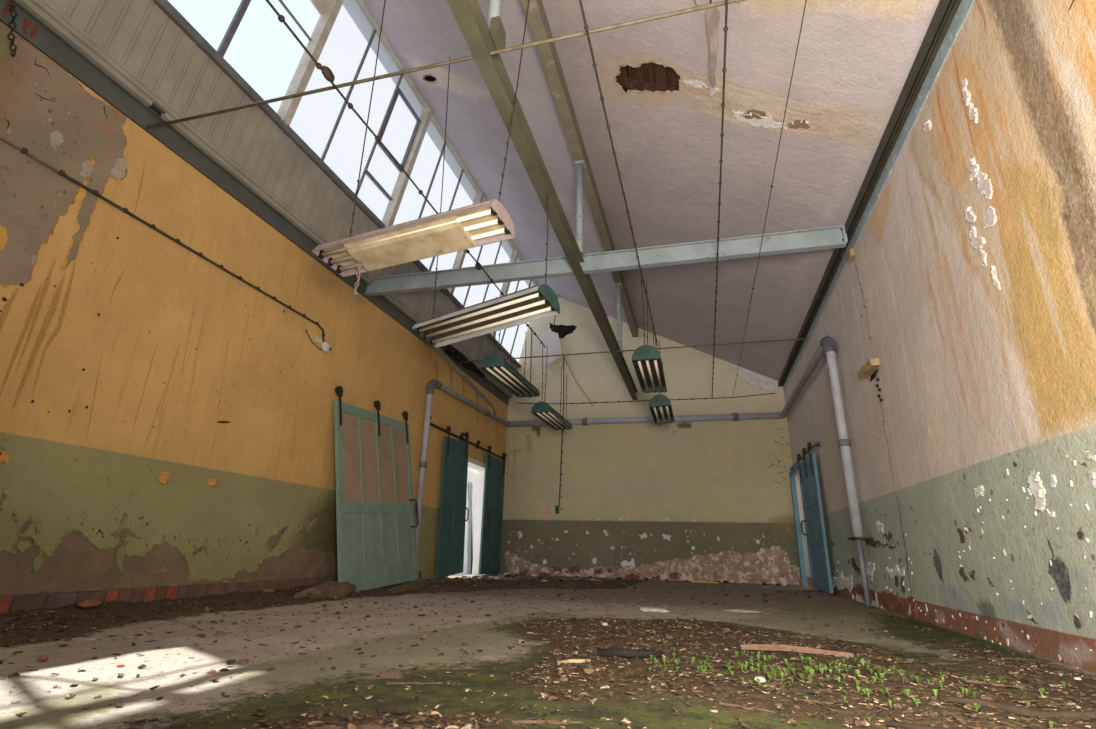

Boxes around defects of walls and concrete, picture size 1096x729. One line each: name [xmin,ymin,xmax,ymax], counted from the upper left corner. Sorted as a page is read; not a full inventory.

flaking render [0,22,128,312]
water stain [981,0,1096,267]
water stain [1009,188,1080,389]
peeling [0,489,338,613]
spalling [504,518,802,586]
flaking render [832,510,1044,654]
peeling [955,474,1014,596]
peeling [1022,470,1073,530]
peeling [1065,451,1096,488]
peeling [1074,611,1092,628]